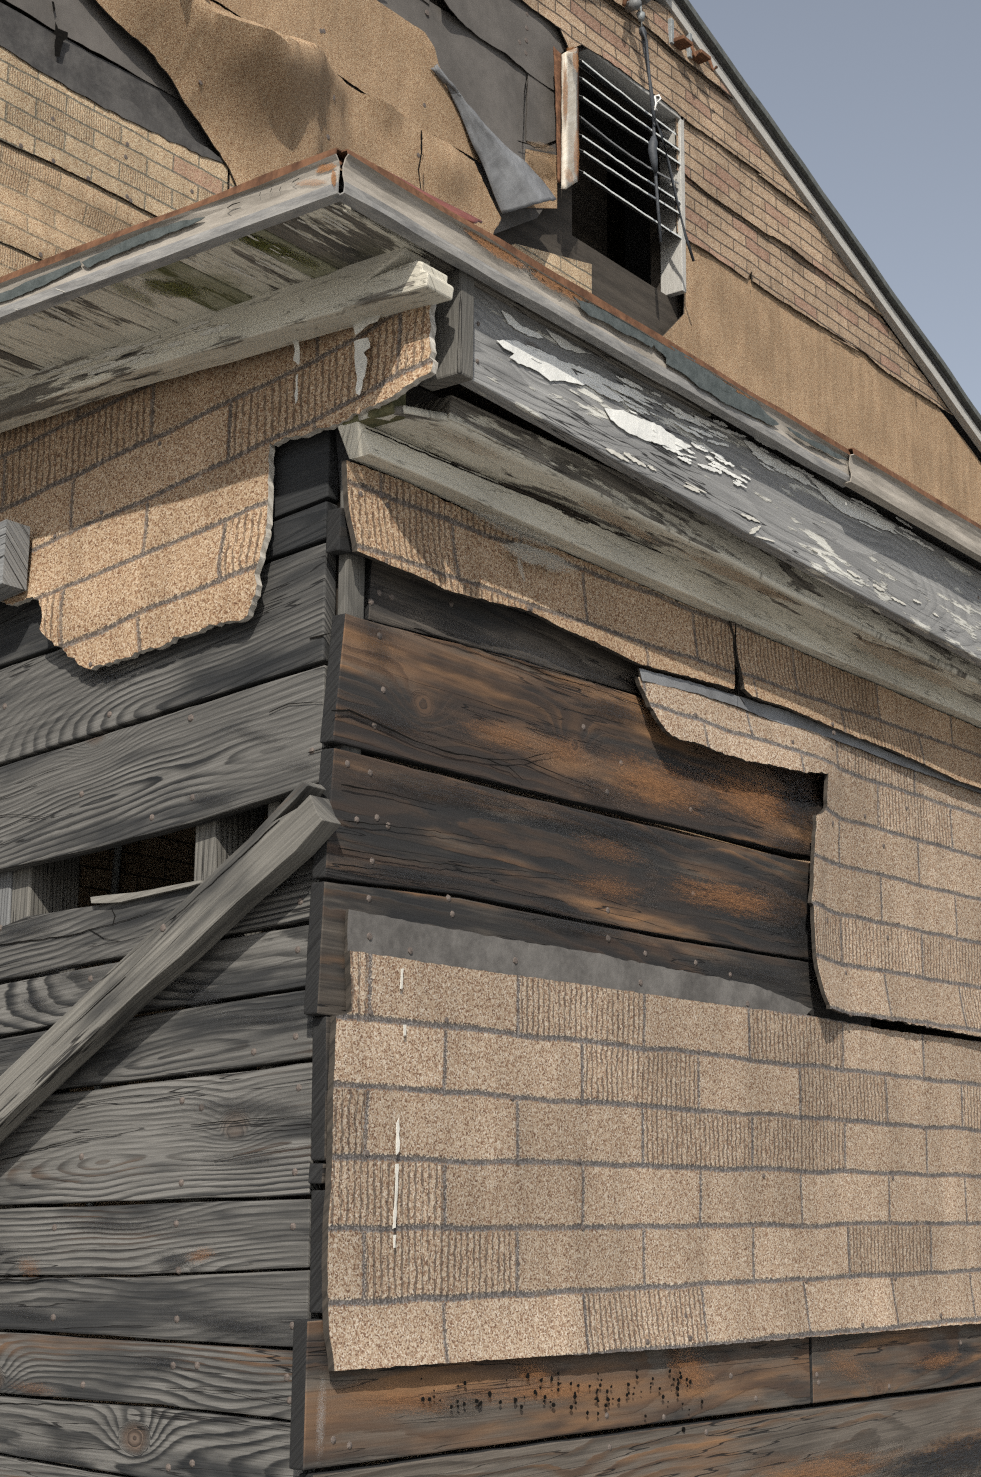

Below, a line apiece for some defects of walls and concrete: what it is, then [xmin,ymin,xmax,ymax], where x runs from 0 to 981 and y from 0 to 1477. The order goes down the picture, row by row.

peeling [0,217,230,395]
peeling [283,208,351,243]
peeling [496,296,934,551]
peeling [847,570,939,617]